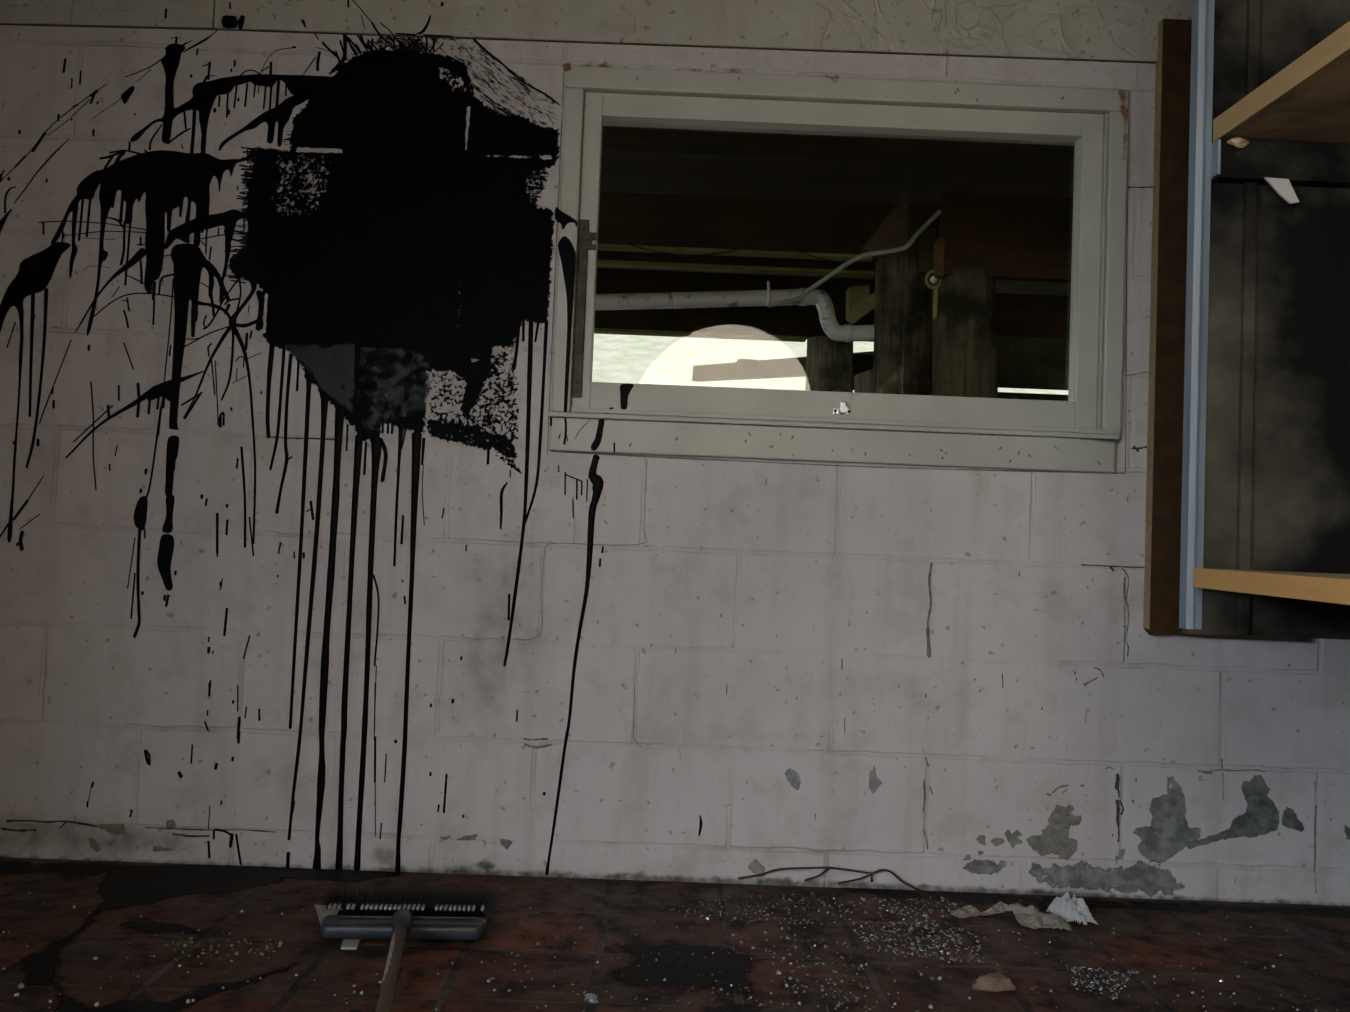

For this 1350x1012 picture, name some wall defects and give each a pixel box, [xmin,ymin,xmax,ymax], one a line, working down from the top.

crack [925,562,933,658]
peeling [785,768,801,790]
peeling [869,766,882,794]
crack [1046,767,1124,842]
peeling [963,775,1304,897]